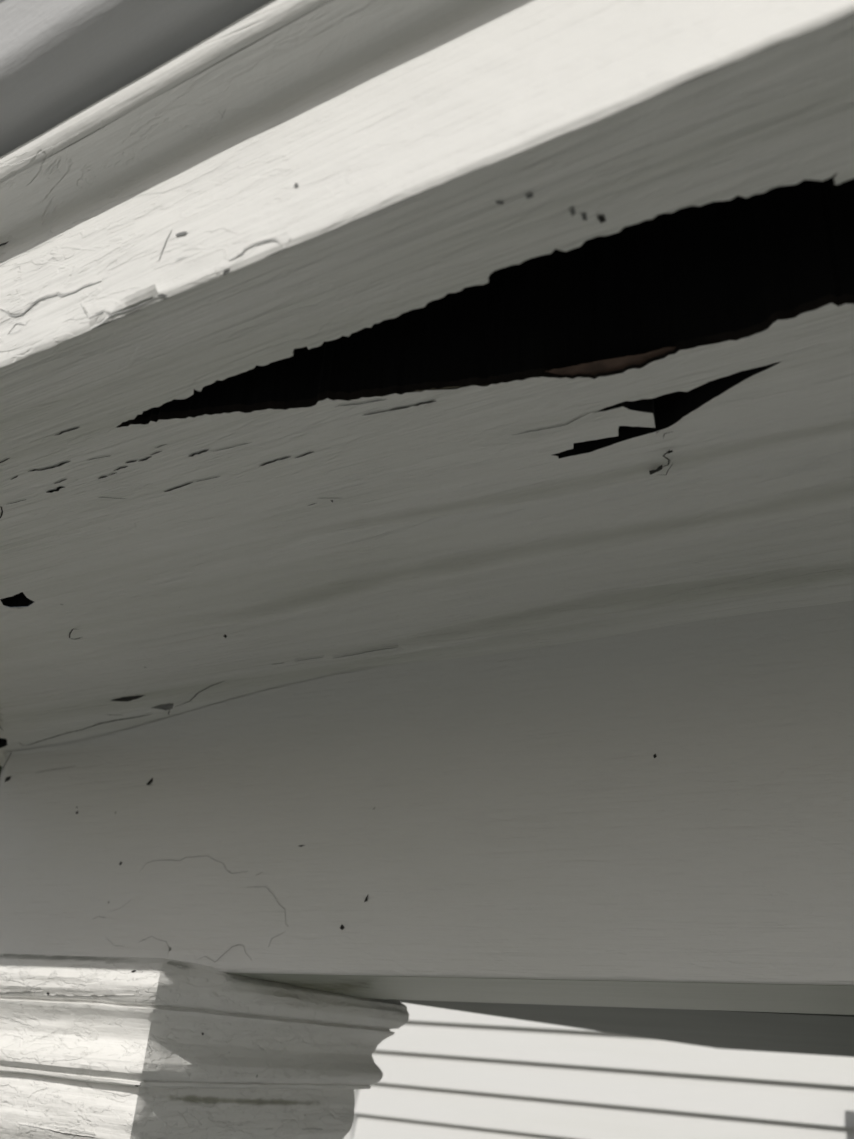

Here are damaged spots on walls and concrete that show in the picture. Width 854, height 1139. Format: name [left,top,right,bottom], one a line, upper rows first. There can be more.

crack [0,276,103,317]
crack [17,1122,94,1137]